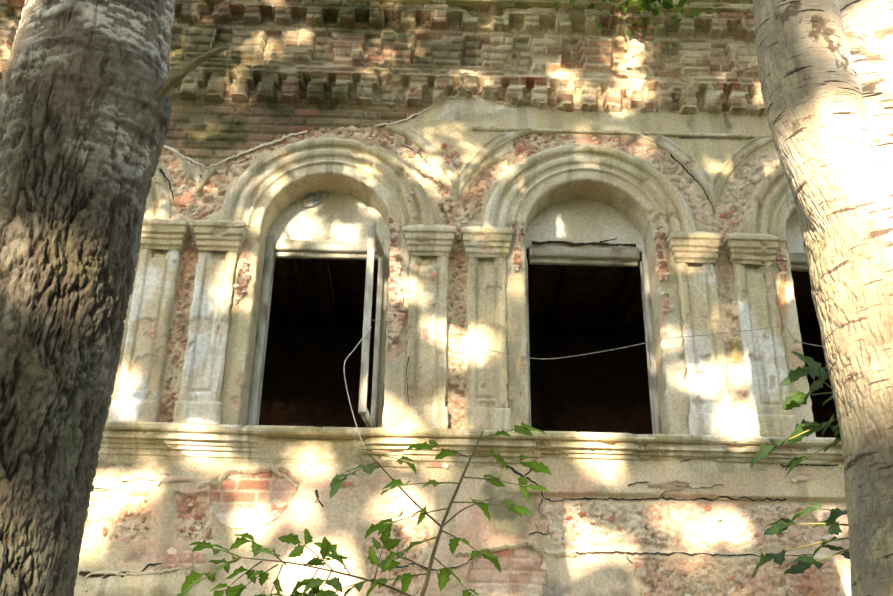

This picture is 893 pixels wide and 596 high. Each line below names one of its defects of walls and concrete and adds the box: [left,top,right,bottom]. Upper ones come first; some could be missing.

flaking render [170,181,205,249]
flaking render [387,218,406,350]
flaking render [164,547,205,575]
flaking render [85,466,298,540]
flaking render [456,500,669,596]
crack [496,465,815,564]
flaking render [657,504,846,596]
crack [777,462,839,470]